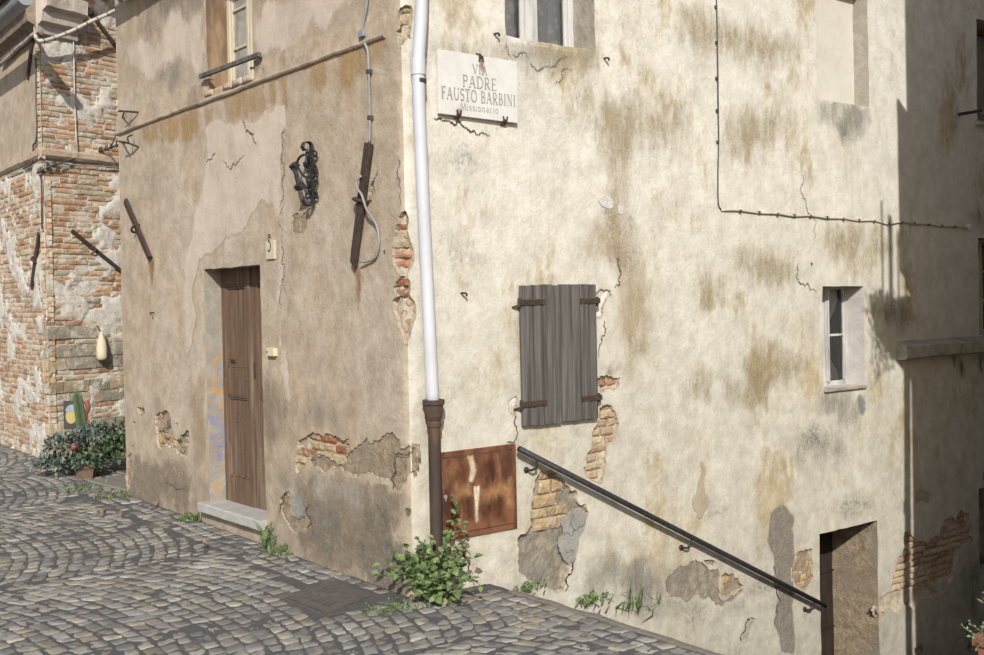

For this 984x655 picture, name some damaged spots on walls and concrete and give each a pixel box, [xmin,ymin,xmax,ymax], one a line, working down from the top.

flaking render [392,211,416,345]
flaking render [598,374,620,392]
flaking render [125,406,190,509]
flaking render [294,431,420,491]
flaking render [583,404,619,484]
flaking render [279,493,311,533]
flaking render [517,469,589,593]
flaking render [664,558,744,607]
flaking render [791,548,814,592]
flaking render [871,509,974,620]